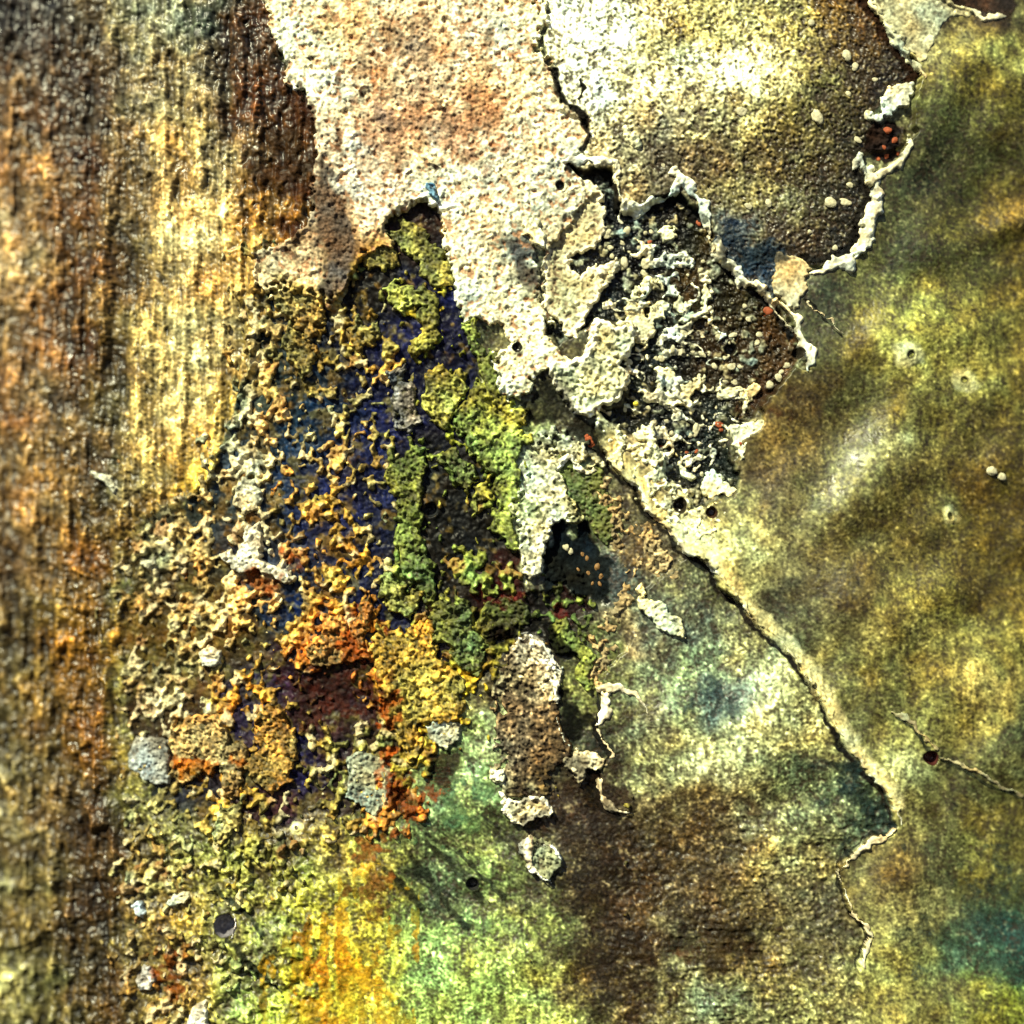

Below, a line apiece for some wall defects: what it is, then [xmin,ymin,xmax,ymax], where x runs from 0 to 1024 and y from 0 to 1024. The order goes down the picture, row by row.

spalling [864,81,915,163]
peeling [251,0,812,510]
peeling [140,556,157,572]
peeling [219,477,297,584]
peeling [508,425,619,603]
peeling [128,736,172,785]
peeling [198,644,222,668]
peeling [345,751,394,817]
peeling [425,721,462,751]
peeling [489,633,608,883]
crack [591,421,904,968]
crack [891,711,1024,799]